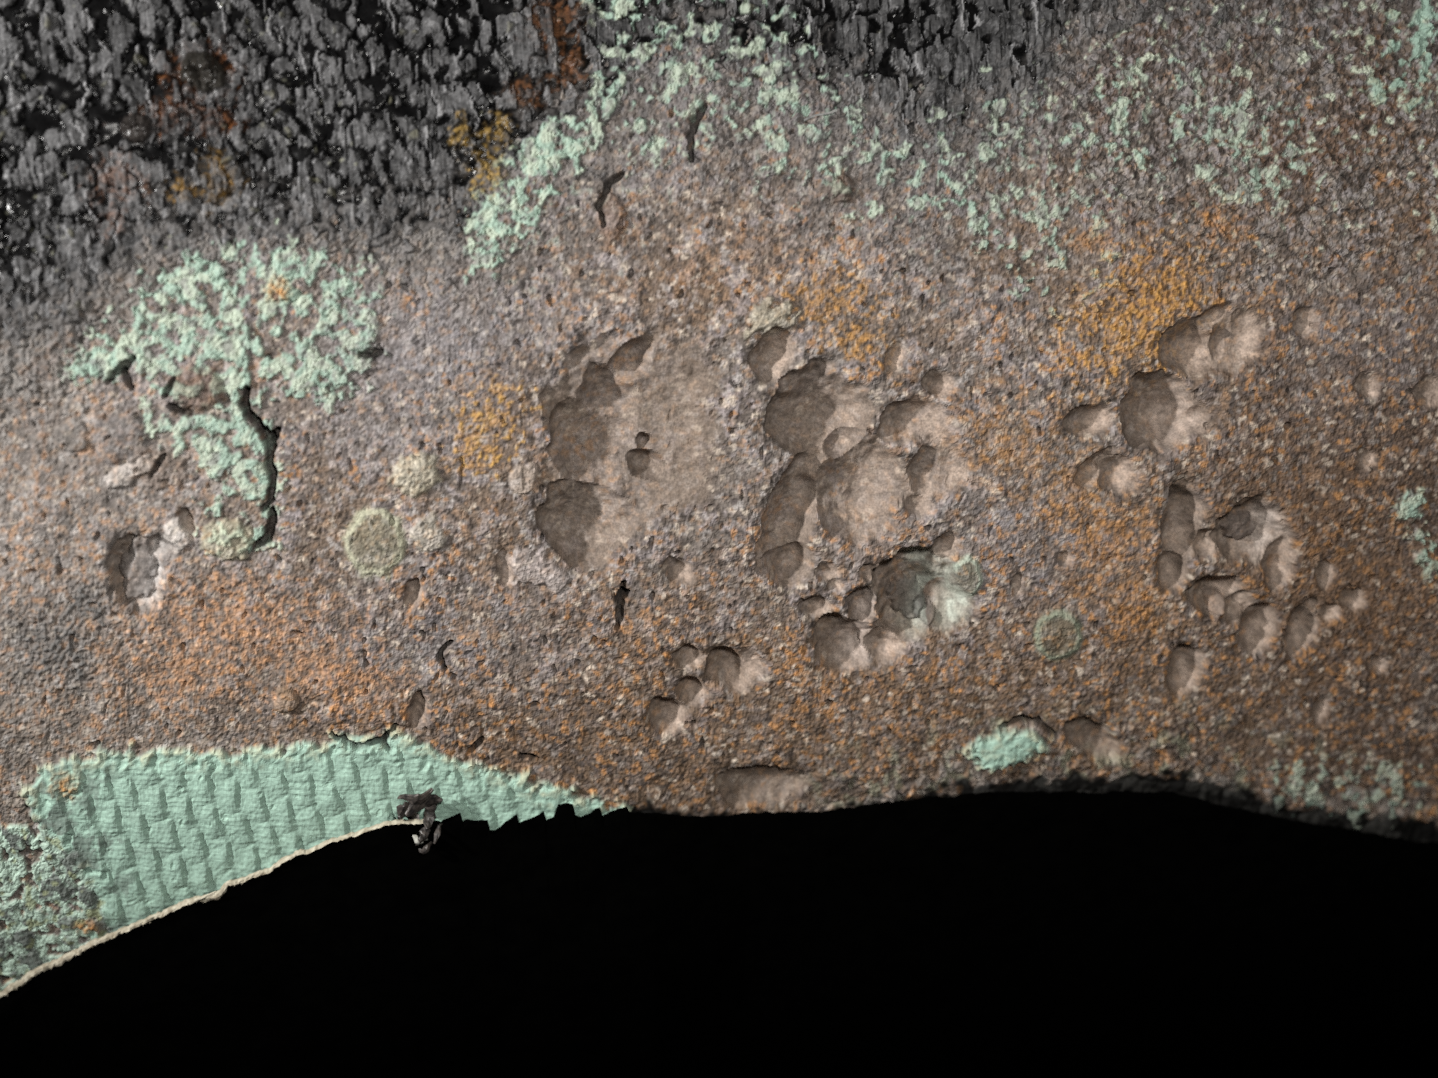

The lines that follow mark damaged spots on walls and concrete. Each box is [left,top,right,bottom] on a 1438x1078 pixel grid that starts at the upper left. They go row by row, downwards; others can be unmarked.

hole [521,311,978,679]
rust [748,232,936,391]
hole [1061,300,1270,497]
rust [940,175,1438,726]
hole [1155,471,1371,661]
hole [1292,303,1321,340]
hole [1354,445,1379,473]
hole [1353,369,1383,400]
hole [646,642,773,736]
hole [1166,642,1209,696]